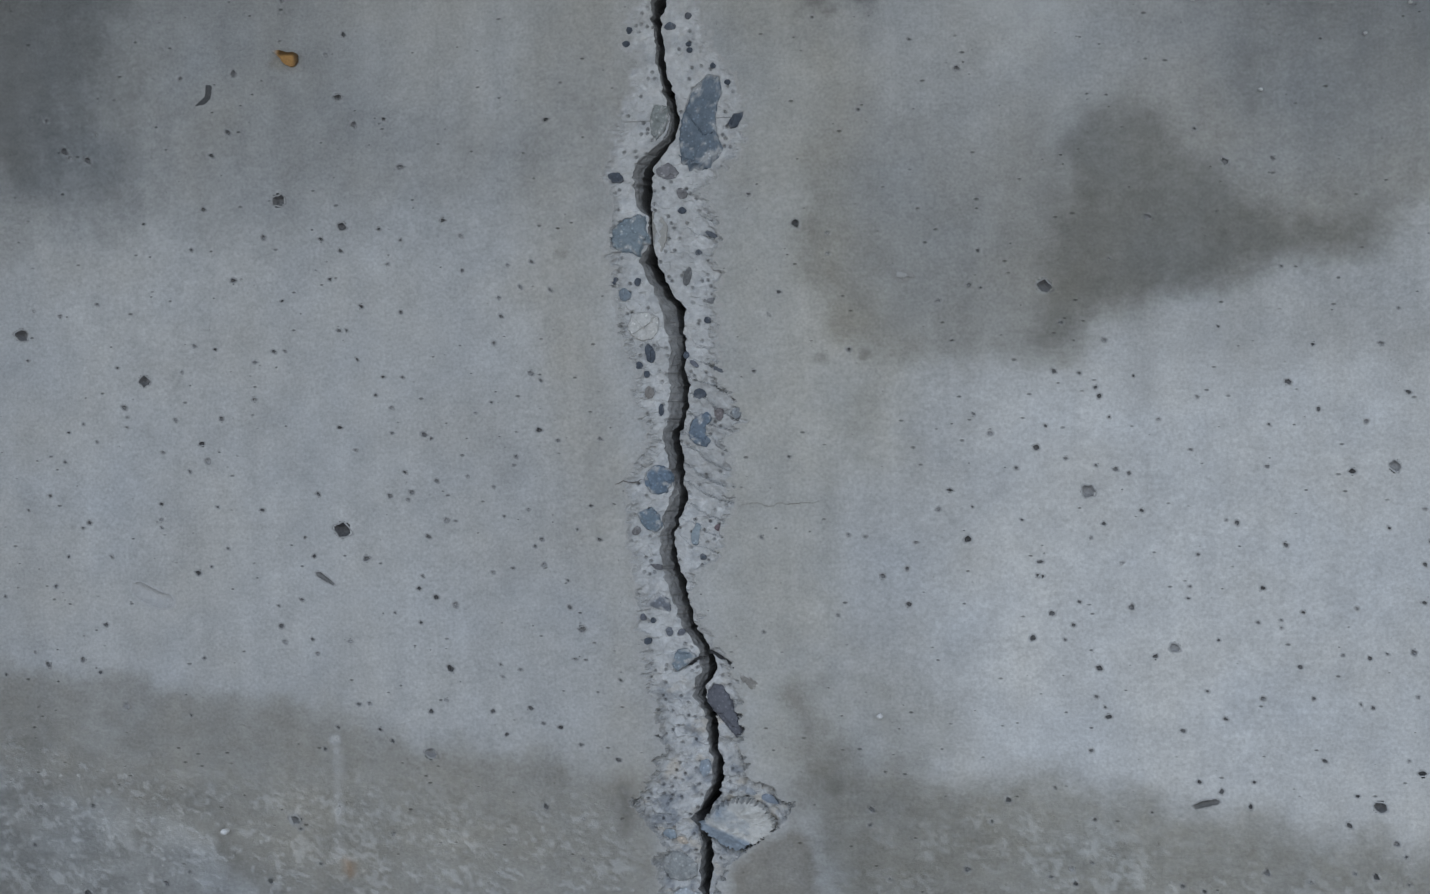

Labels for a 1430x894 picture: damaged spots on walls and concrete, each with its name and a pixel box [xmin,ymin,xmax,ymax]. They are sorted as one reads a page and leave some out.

crack [617,0,734,894]
spalling [597,0,798,894]